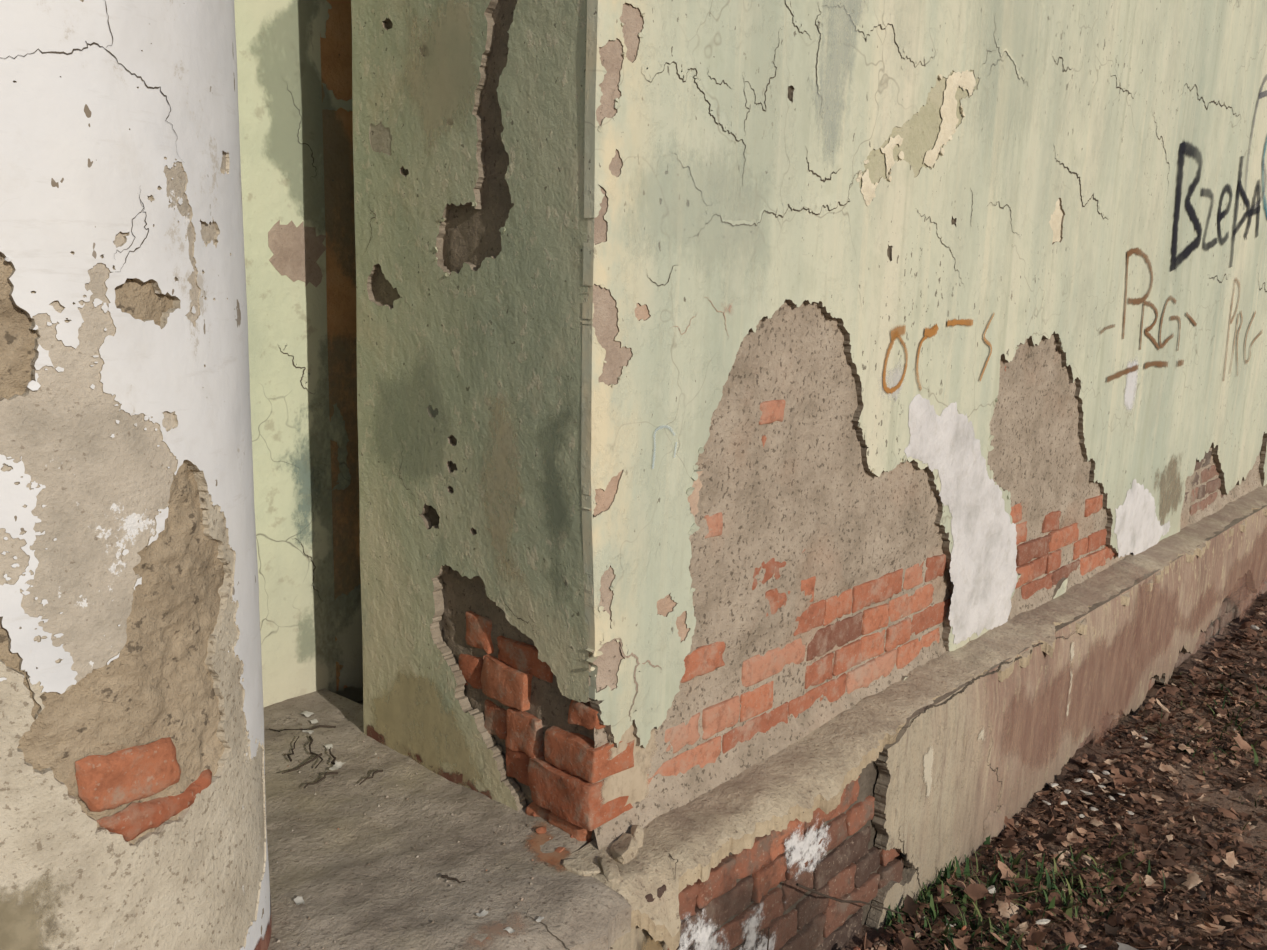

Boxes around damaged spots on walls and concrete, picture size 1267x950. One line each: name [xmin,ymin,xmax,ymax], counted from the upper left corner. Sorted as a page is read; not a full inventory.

crack [0,1,178,154]
crack [641,0,937,286]
crack [916,188,1019,288]
peeling [0,157,265,950]
flaking render [439,300,952,850]
flaking render [987,334,1131,620]
damp [1066,643,1074,720]
damp [0,878,61,950]
crack [526,907,569,950]
damp [679,903,775,950]
flaking render [645,760,906,950]
damp [784,825,829,879]